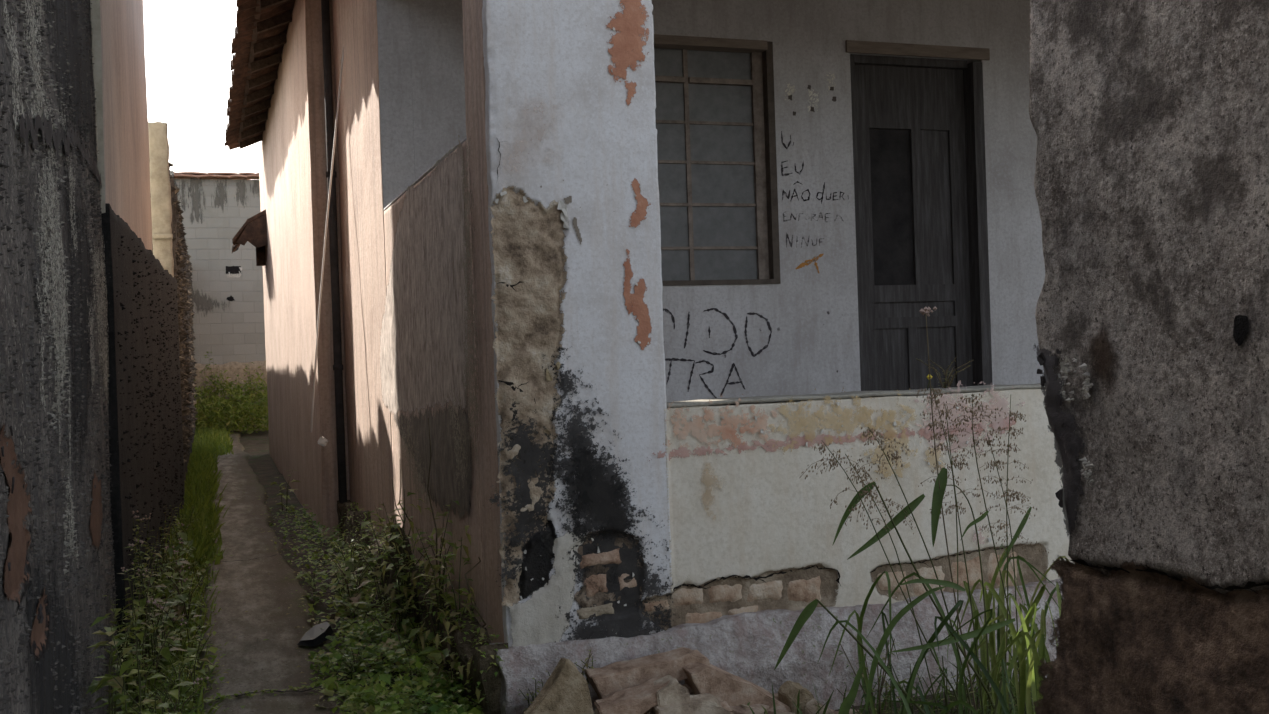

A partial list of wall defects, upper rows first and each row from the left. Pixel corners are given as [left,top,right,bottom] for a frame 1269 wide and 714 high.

peeling [606,0,649,105]
peeling [622,249,652,350]
spalling [483,186,582,607]
flaking render [1033,345,1094,537]
flaking render [30,587,52,658]
leakage [518,444,651,600]
flaking render [574,530,839,631]
spalling [870,543,1269,714]